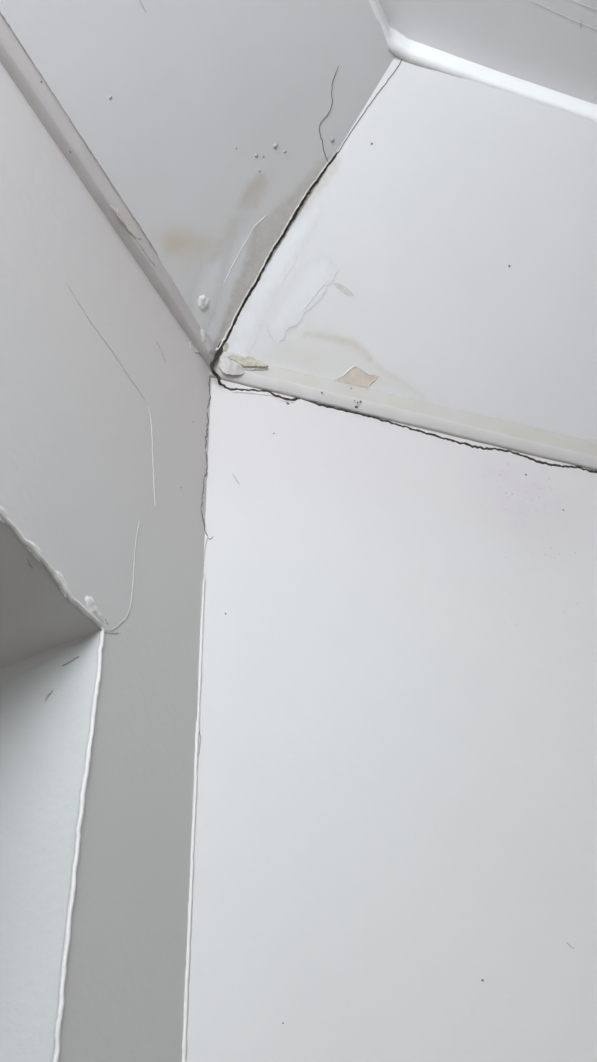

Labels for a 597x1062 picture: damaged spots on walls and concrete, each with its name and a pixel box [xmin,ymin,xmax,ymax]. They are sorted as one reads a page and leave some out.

crack [201,59,597,579]
crack [194,683,202,757]